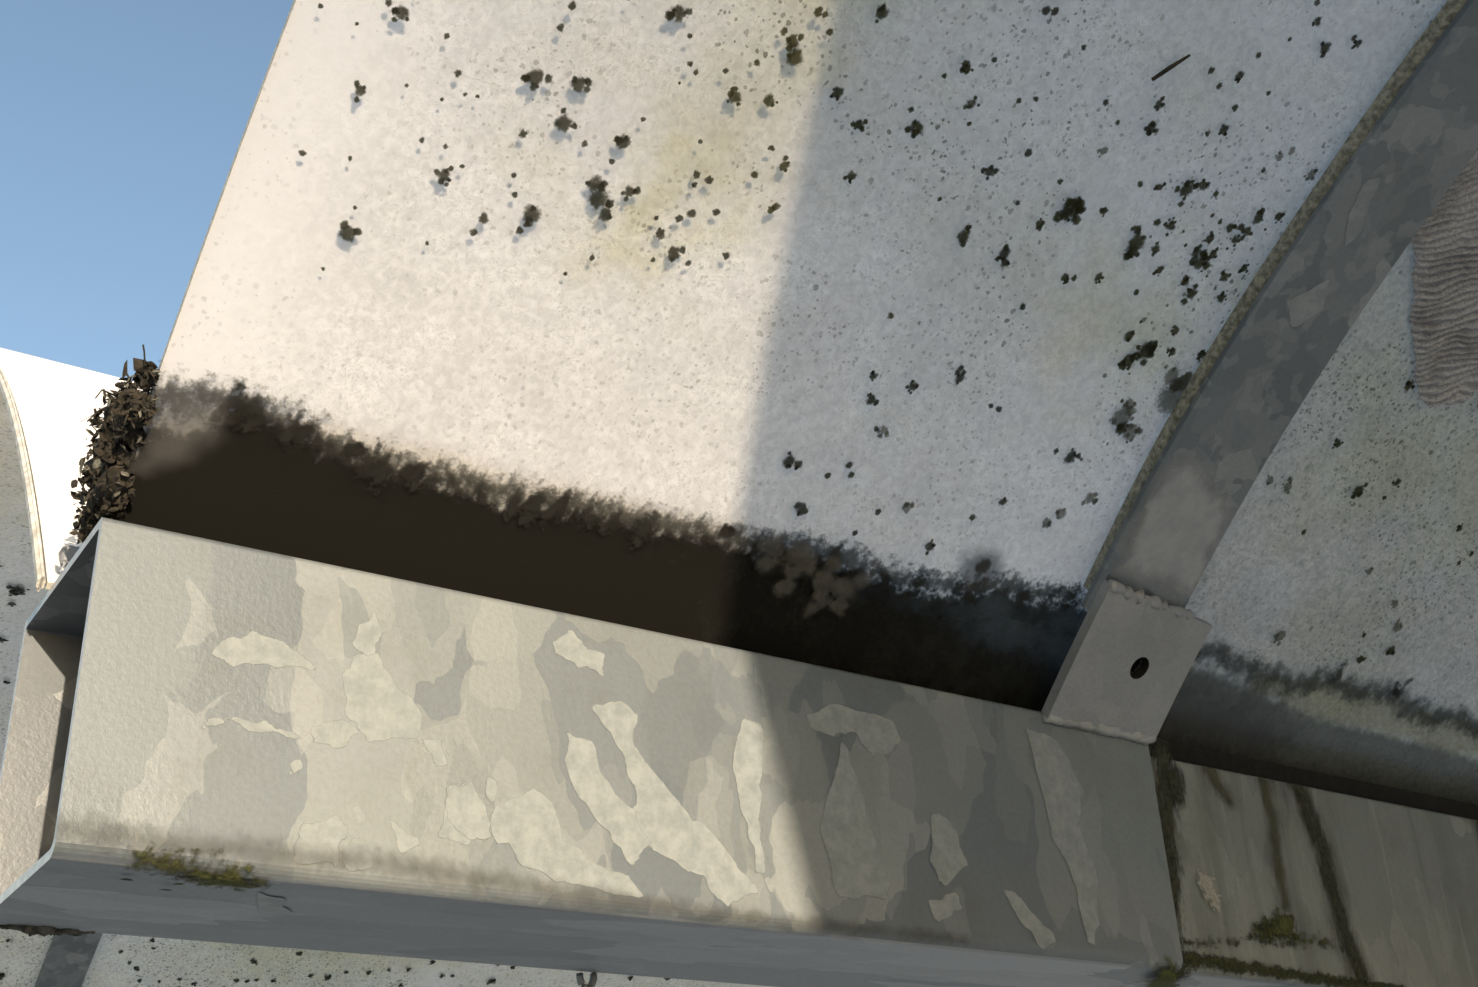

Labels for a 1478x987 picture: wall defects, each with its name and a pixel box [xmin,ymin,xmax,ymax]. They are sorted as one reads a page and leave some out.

leakage [386,0,409,22]
leakage [520,70,552,91]
leakage [554,108,588,147]
leakage [339,206,362,242]
leakage [434,164,465,187]
leakage [511,173,540,234]
leakage [585,134,641,221]
leakage [651,209,720,266]
leakage [1036,179,1108,231]
leakage [1124,178,1285,307]
leakage [1103,318,1206,411]
leakage [1156,633,1478,985]